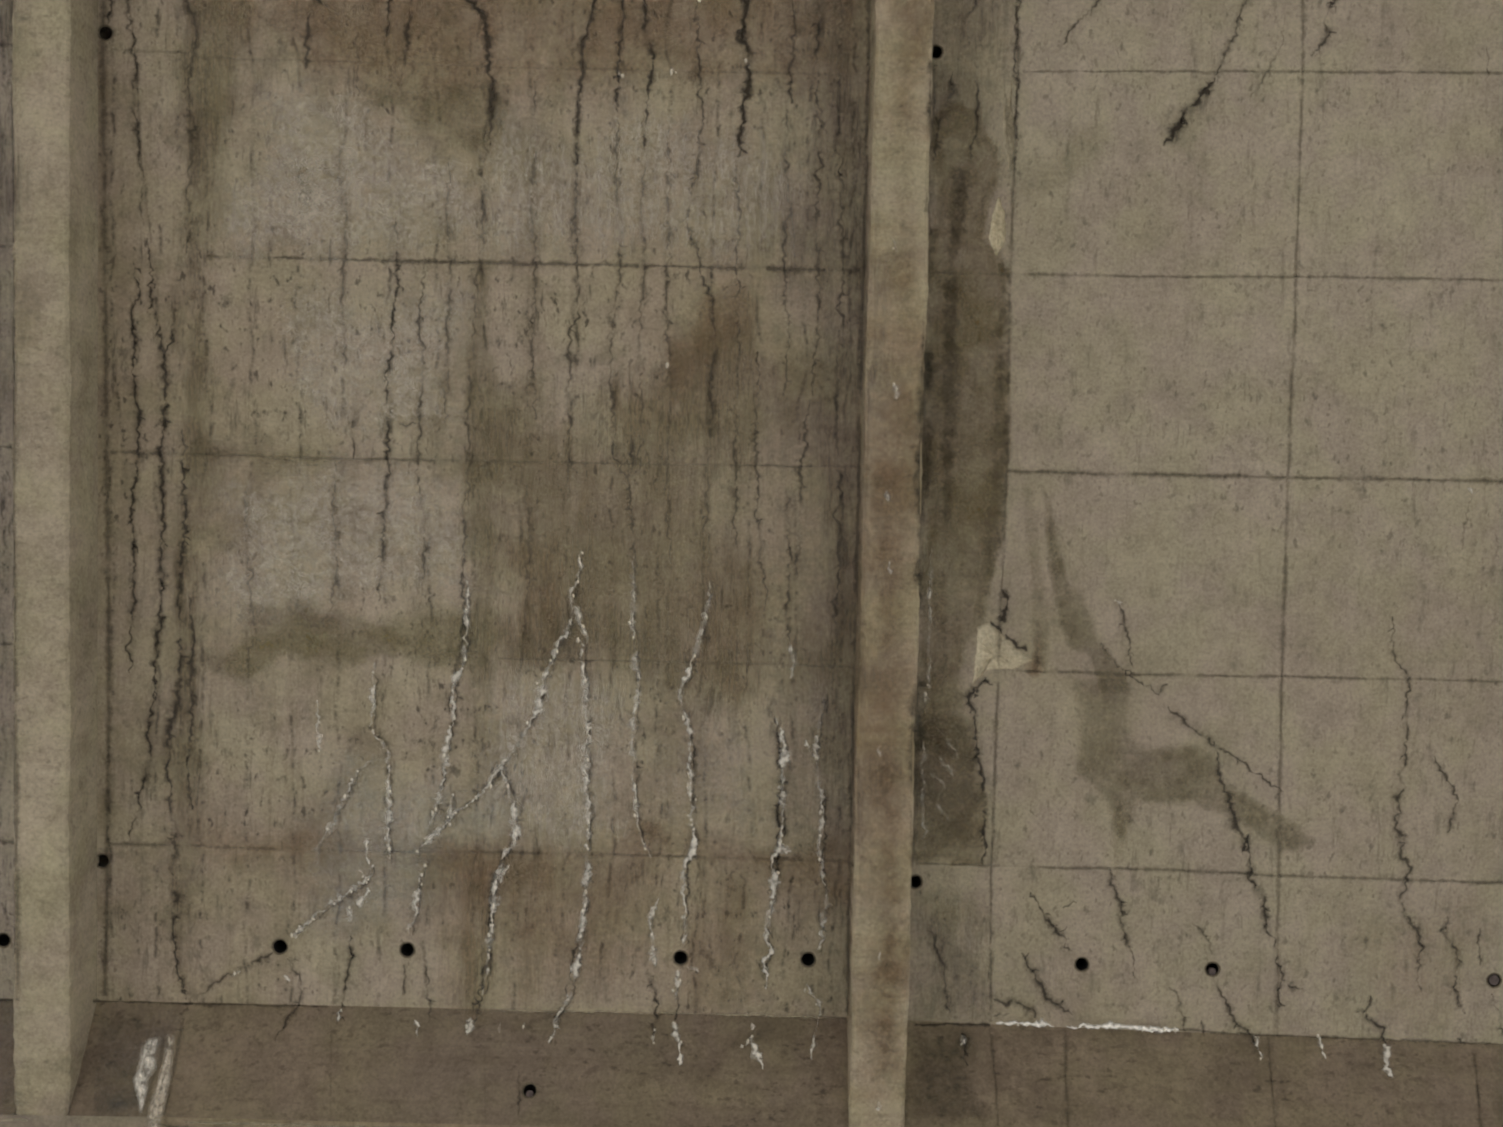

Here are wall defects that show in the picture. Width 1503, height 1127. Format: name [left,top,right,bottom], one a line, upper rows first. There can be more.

crack [1163,0,1247,146]
crack [107,0,302,1035]
water stain [226,587,553,995]
crack [331,0,497,712]
water stain [498,393,749,1044]
crack [530,0,848,691]
water stain [762,696,846,989]
water stain [912,63,1008,864]
spalling [972,623,1033,684]
crack [1100,602,1298,1007]
crack [1388,616,1482,1044]
water stain [115,1038,172,1127]